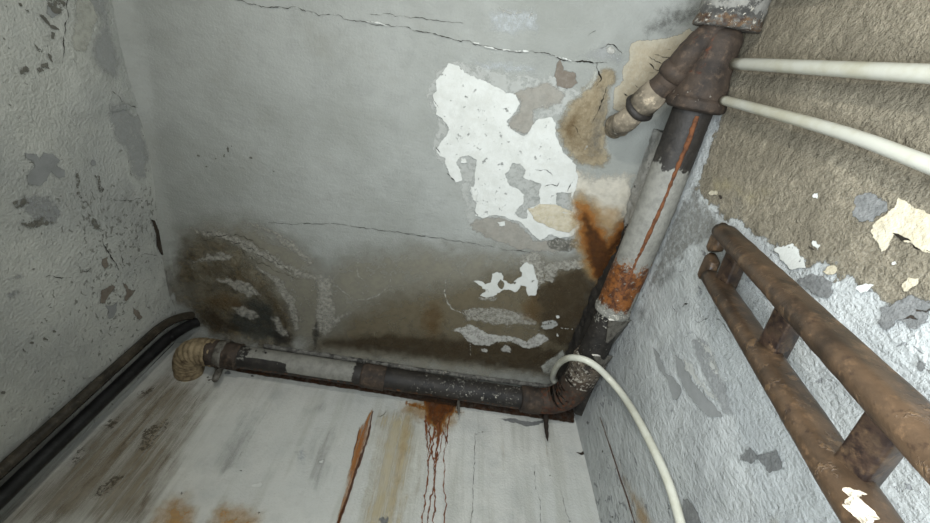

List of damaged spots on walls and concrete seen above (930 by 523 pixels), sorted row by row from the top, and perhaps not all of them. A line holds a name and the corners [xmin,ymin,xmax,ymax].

crack [241,0,604,82]
flaking render [595,28,693,111]
spalling [738,0,930,64]
damp [169,224,597,377]
peeling [427,60,583,252]
rust [574,196,624,279]
spalling [695,70,930,331]
rust [225,368,575,523]